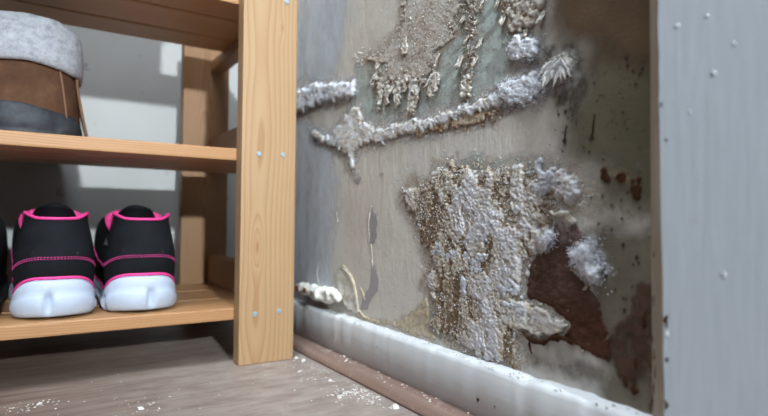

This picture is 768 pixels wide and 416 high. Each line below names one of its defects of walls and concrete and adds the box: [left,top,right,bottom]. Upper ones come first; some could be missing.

peeling [350,0,549,117]
water stain [294,0,652,415]
spalling [501,210,611,362]